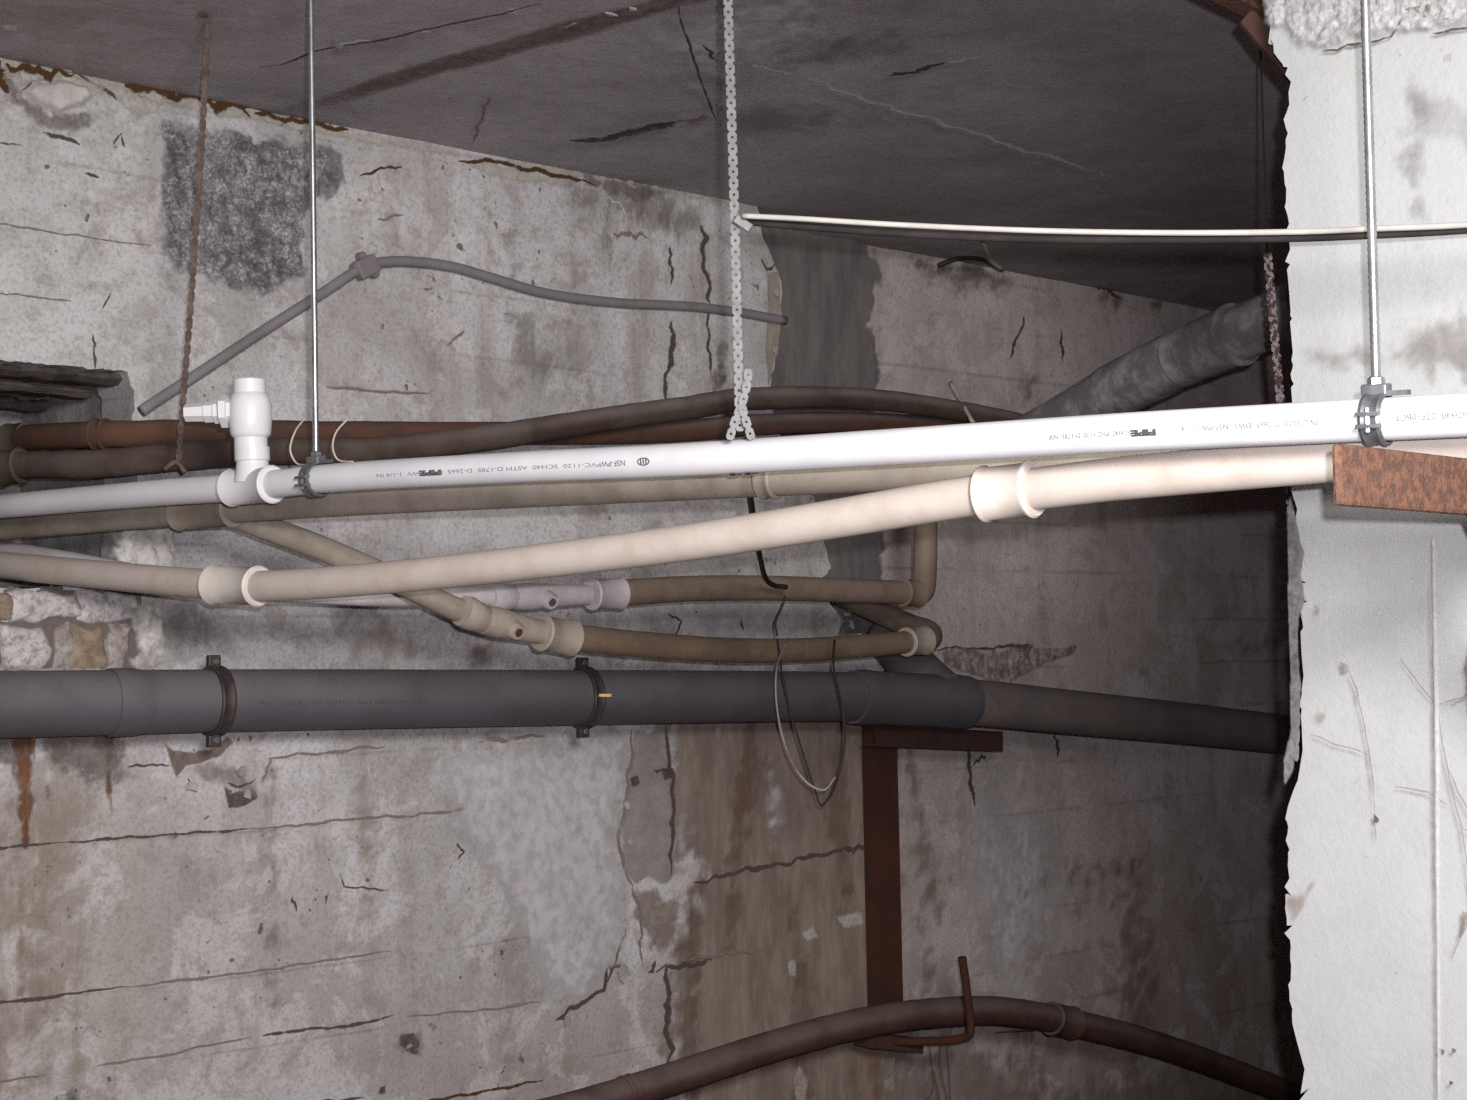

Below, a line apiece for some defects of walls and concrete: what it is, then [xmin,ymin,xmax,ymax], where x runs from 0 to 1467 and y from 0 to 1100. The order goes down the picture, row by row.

damp [0,58,731,220]
crack [460,6,717,186]
damp [633,0,819,88]
spalling [1266,0,1467,52]
flaking render [0,584,142,671]
corrosion [12,737,36,848]
crack [0,807,465,860]
peeling [617,730,677,966]
damp [660,721,868,1058]
crack [0,950,392,1003]
crack [97,932,763,1066]
damp [689,1028,1267,1100]